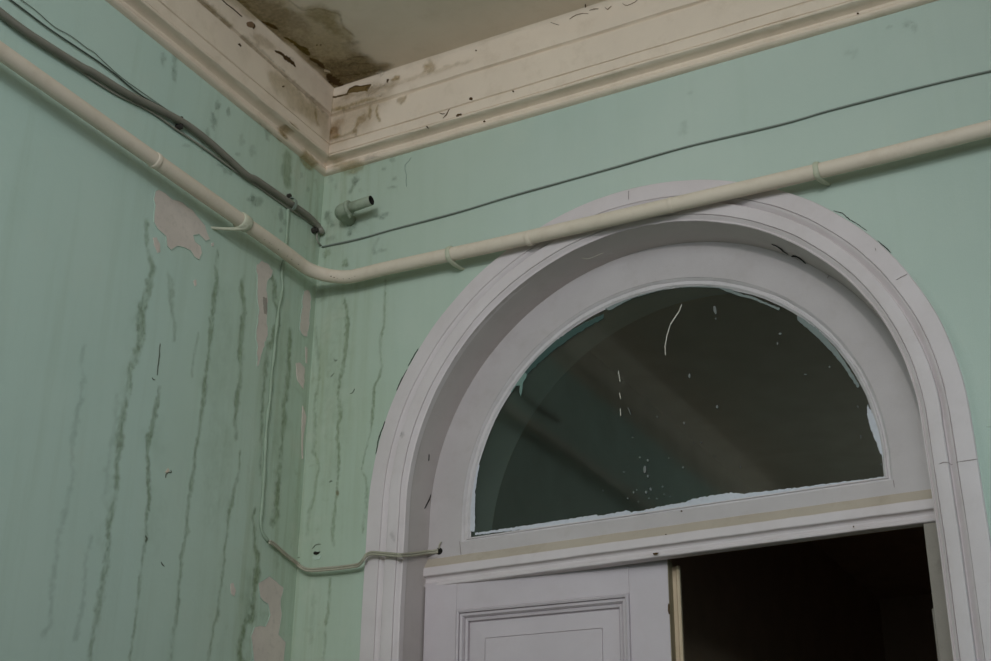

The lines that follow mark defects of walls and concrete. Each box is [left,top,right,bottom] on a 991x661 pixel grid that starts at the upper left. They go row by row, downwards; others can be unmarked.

peeling [153,189,214,260]
peeling [256,260,273,367]
peeling [250,576,286,661]